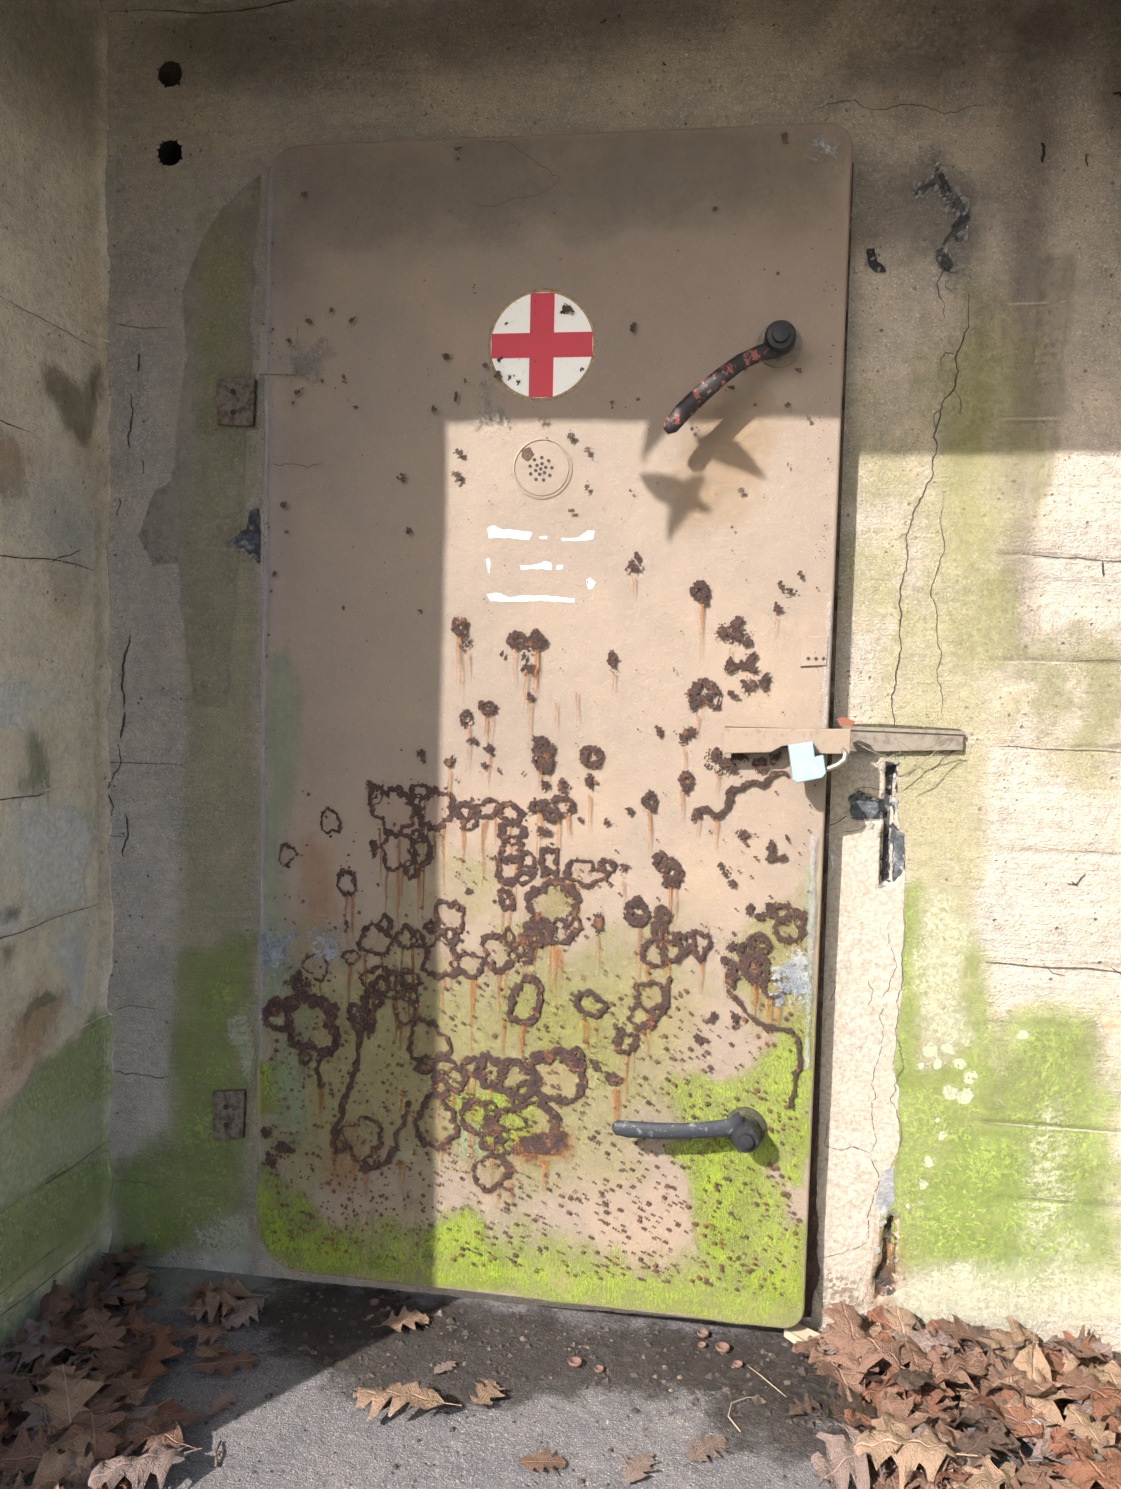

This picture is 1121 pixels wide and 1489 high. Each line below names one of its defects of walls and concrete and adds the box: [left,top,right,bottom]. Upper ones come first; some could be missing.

spalling [912,160,971,272]
rust [690,568,710,605]
rust [768,571,818,615]
crack [830,267,970,832]
spalling [843,759,905,888]
rust [260,615,827,1317]
water stain [880,886,1011,1260]